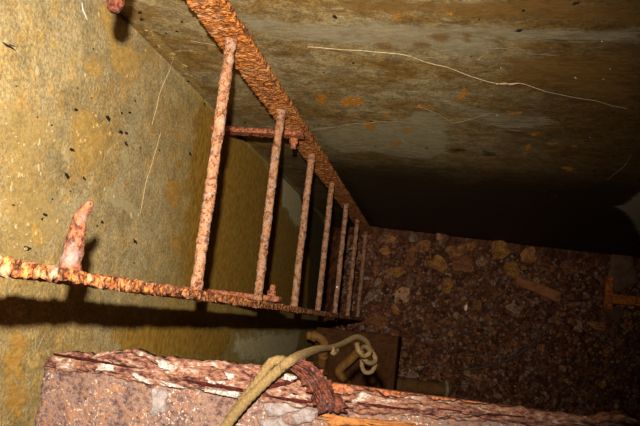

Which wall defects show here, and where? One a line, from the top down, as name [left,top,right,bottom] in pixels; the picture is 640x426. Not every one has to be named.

crack [314,47,628,109]
rust [4,330,44,423]
rust [43,331,262,418]
rust [256,372,640,426]